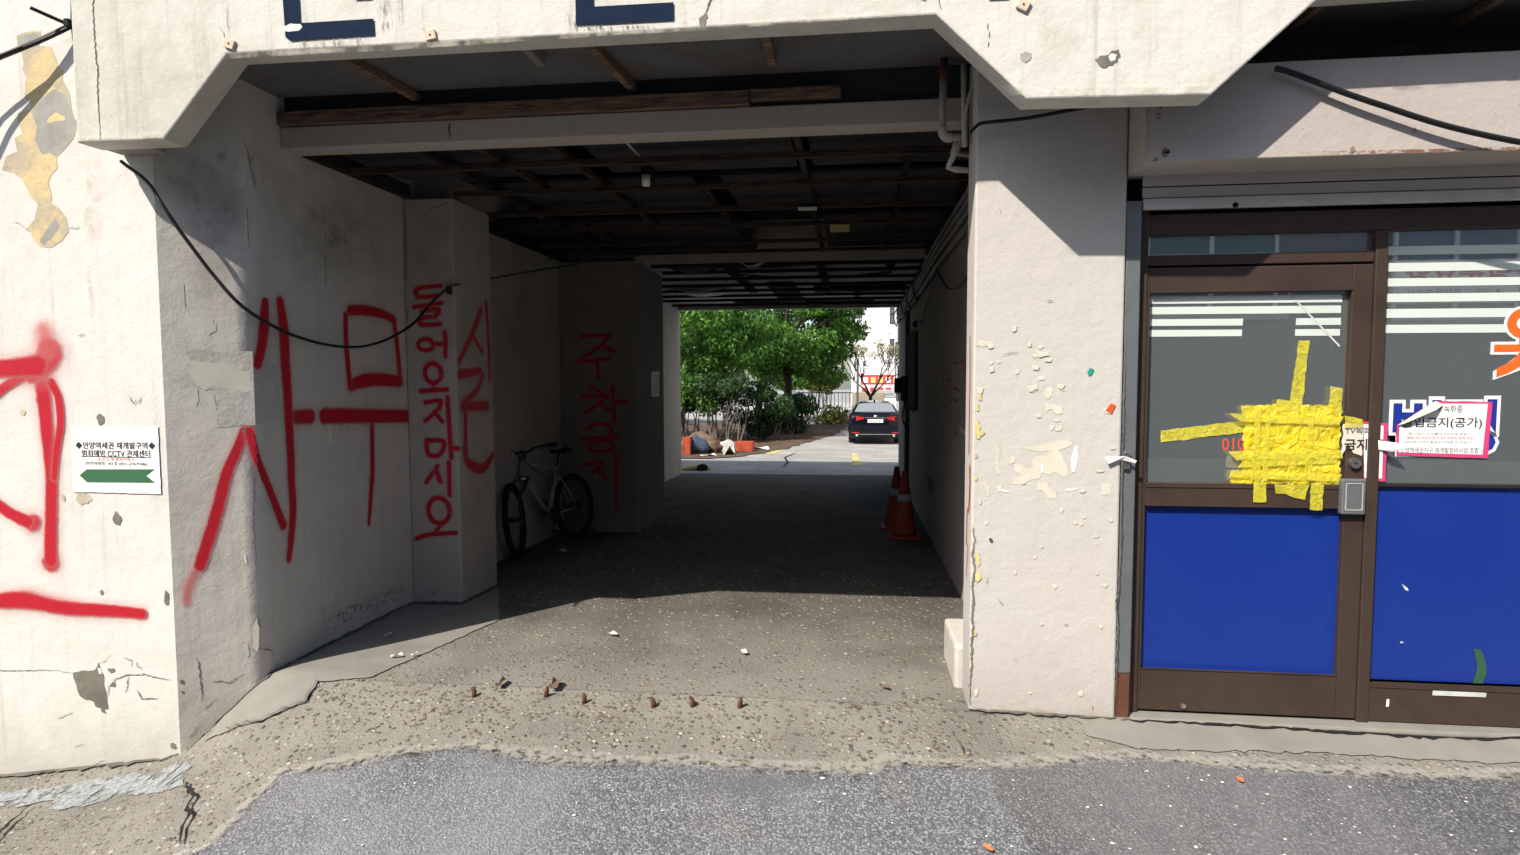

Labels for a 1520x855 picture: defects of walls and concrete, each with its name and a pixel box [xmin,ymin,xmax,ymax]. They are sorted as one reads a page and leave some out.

peeling [2,31,77,248]
peeling [974,325,1113,538]
spalling [73,663,116,714]